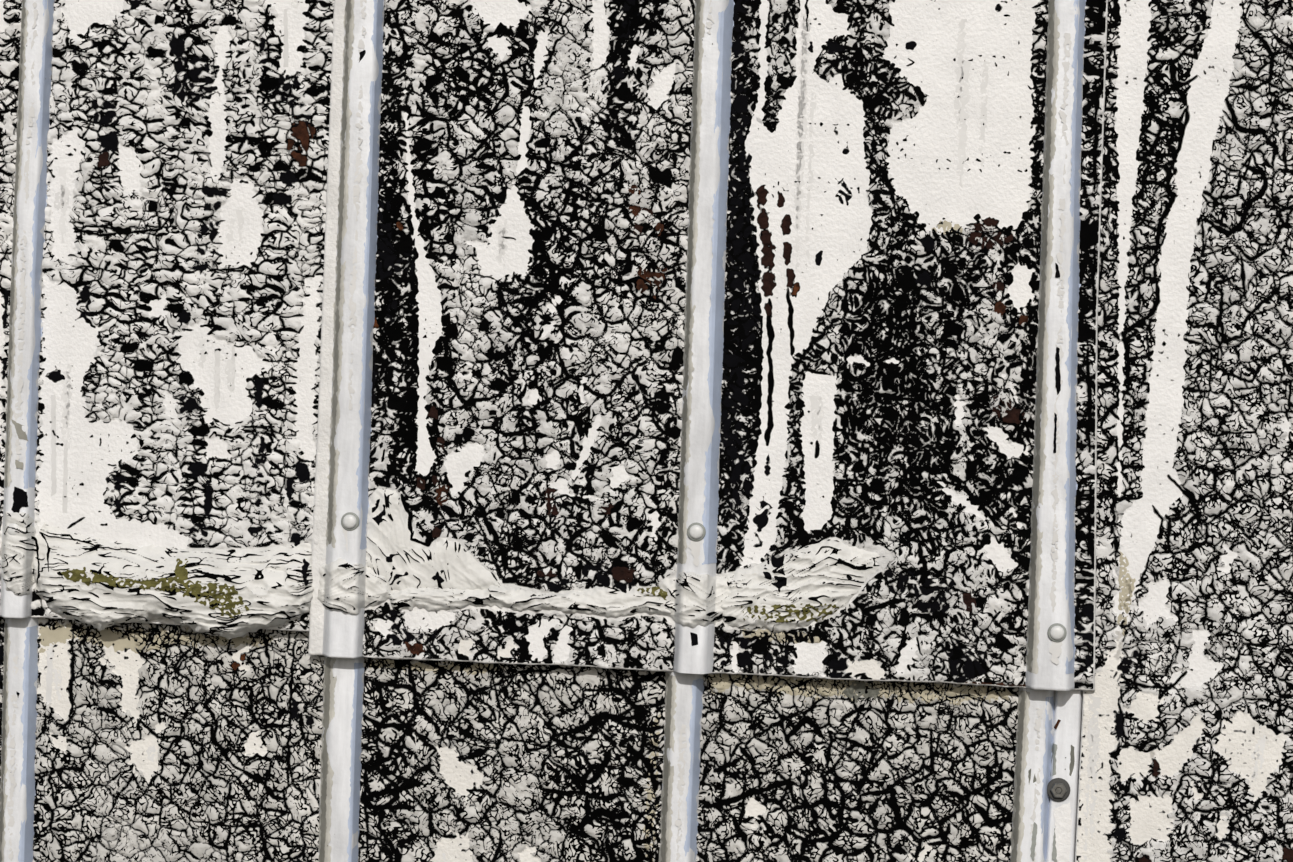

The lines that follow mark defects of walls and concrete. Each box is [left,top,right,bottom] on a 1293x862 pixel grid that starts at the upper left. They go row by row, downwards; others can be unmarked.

peeling [0,94,272,550]
crack [0,0,334,862]
peeling [465,181,536,281]
peeling [470,0,532,61]
crack [323,0,1049,862]
spalling [720,0,793,593]
rust [757,186,800,316]
peeling [883,0,1040,251]
crack [1074,0,1293,862]
peeling [717,617,995,683]
peeling [1051,566,1290,862]
rust [1283,847,1293,862]